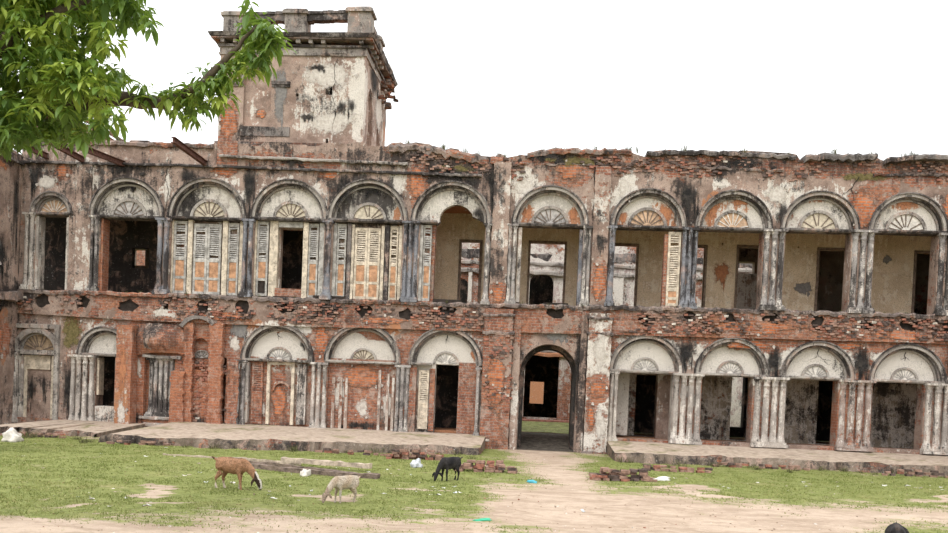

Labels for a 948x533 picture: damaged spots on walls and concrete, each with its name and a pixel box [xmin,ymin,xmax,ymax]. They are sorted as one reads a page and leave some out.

damp [370,67,379,100]
damp [335,100,354,119]
flaking render [217,103,238,141]
flaking render [554,159,584,180]
flaking render [852,189,876,229]
peeling [146,306,175,318]
flaking render [362,314,409,325]
peeling [229,336,240,351]
peeling [117,401,128,424]
flaking render [588,378,608,438]